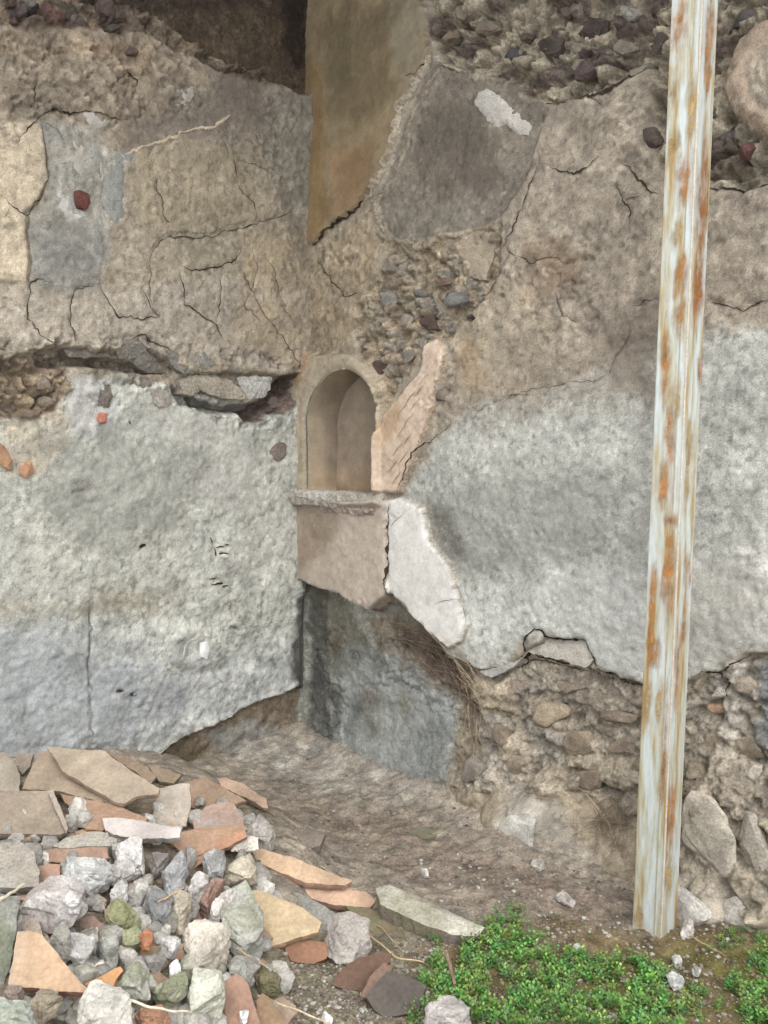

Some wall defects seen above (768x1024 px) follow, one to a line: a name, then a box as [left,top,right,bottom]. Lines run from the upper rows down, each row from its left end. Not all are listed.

rust [669,10,714,154]
flaking render [710,0,768,192]
crack [27,132,301,368]
crack [312,201,363,299]
flaking render [354,0,672,410]
crack [474,156,658,309]
rust [673,255,703,323]
rust [659,344,680,499]
crack [520,628,636,682]
rust [648,539,673,664]
flaking render [449,658,643,821]
flaking render [677,658,768,932]